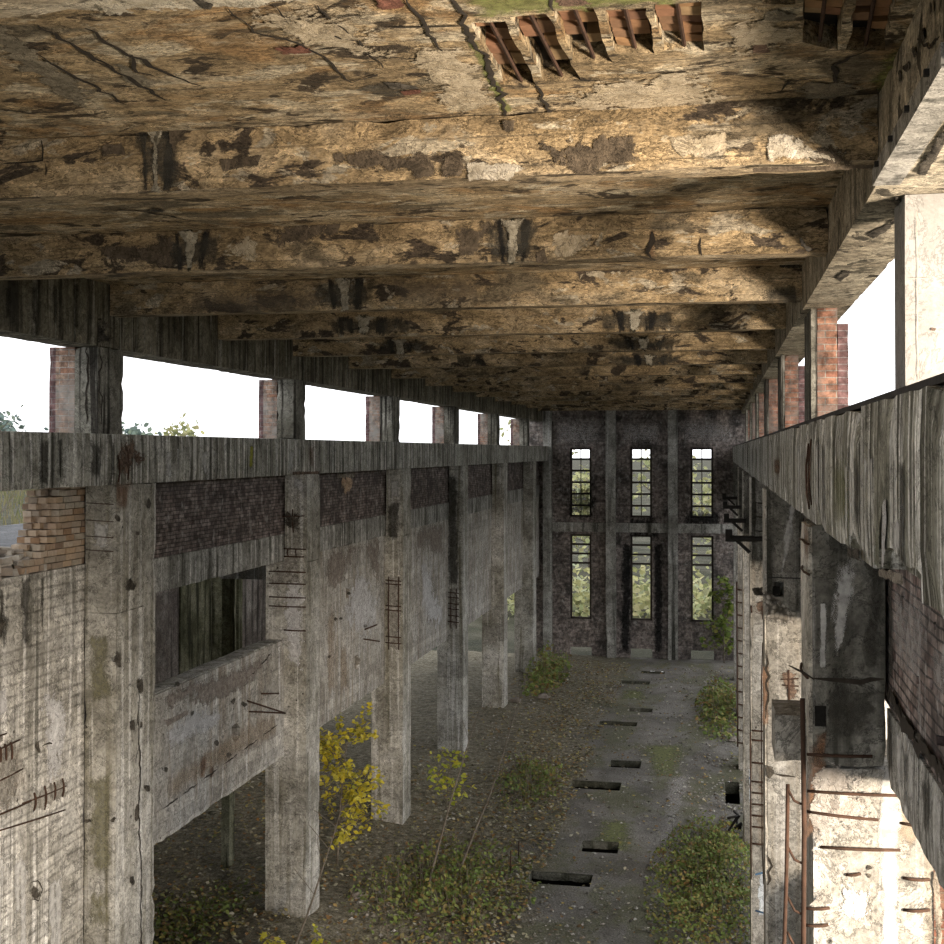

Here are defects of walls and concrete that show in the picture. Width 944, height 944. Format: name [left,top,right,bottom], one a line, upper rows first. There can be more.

crack [37,25,201,105]
flaking render [81,0,497,112]
crack [450,0,508,116]
flaking render [475,0,703,82]
flaking render [535,67,742,113]
flaking render [721,0,892,99]
damp [136,130,184,193]
spalling [889,691,944,770]